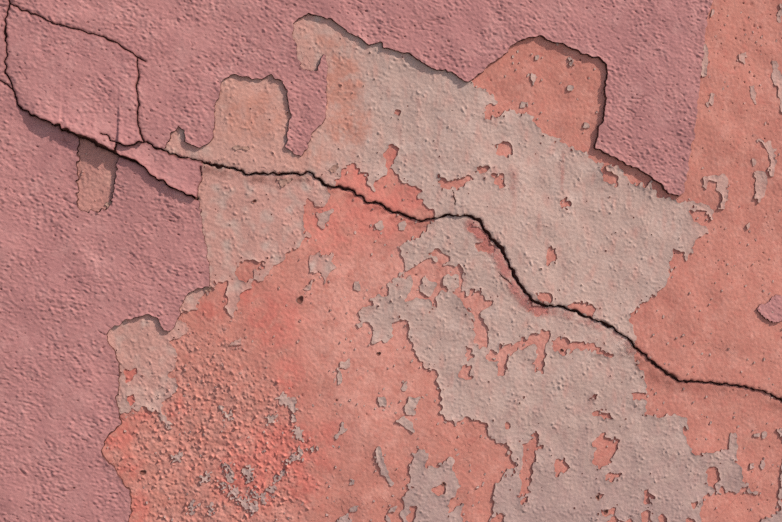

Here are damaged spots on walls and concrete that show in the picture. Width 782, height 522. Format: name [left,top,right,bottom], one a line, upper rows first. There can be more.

peeling [292,14,336,37]
crack [0,0,782,402]
peeling [310,0,782,522]